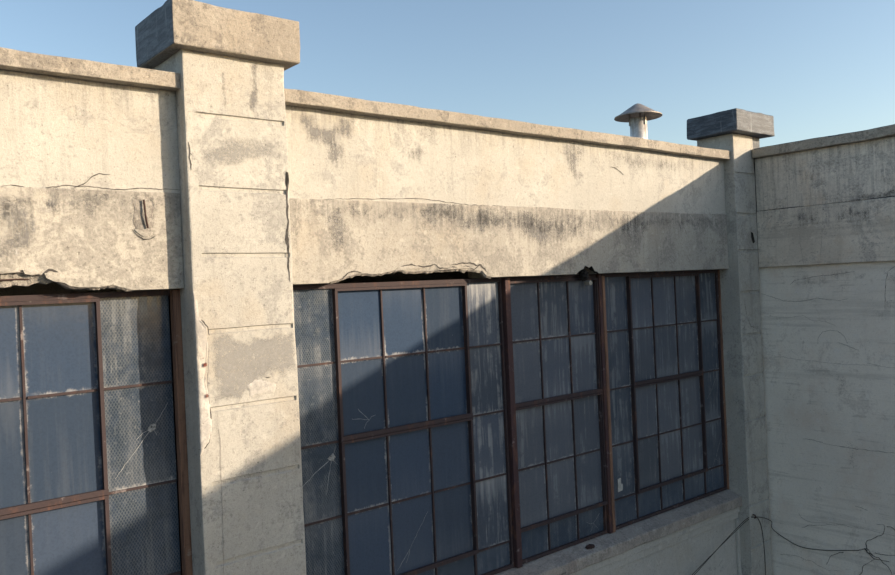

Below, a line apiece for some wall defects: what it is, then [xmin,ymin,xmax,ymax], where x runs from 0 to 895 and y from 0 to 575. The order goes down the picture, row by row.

crack [46,173,178,190]
leakage [0,199,34,257]
leakage [423,203,576,245]
spalling [0,267,132,292]
spalling [329,262,491,284]
spalling [579,266,599,285]